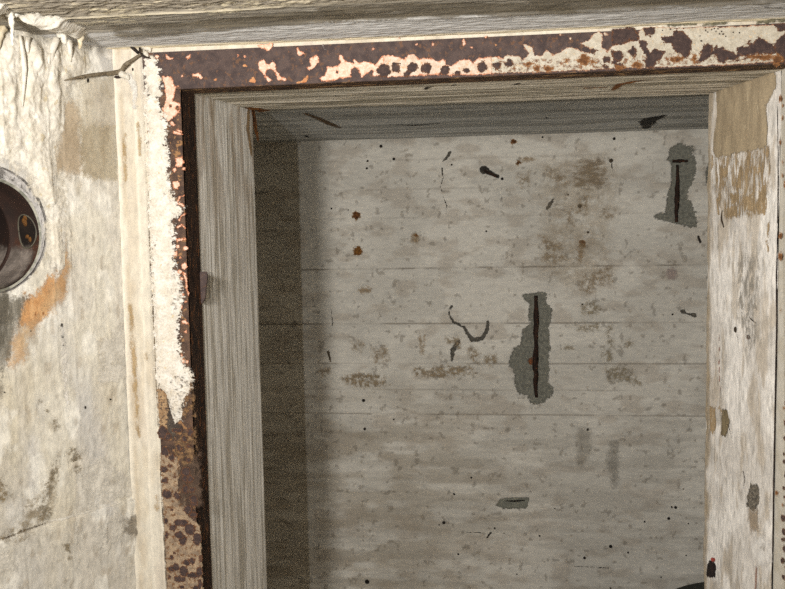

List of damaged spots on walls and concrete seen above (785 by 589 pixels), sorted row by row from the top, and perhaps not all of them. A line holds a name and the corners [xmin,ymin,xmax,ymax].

peeling [249,43,286,83]
rust [492,22,785,72]
damp [0,3,90,282]
peeling [296,23,785,252]
damp [101,0,785,439]
damp [0,294,27,372]
rust [10,252,70,365]
peeling [342,372,385,387]
spalling [509,291,554,405]
rust [771,252,785,589]
rust [157,425,203,589]